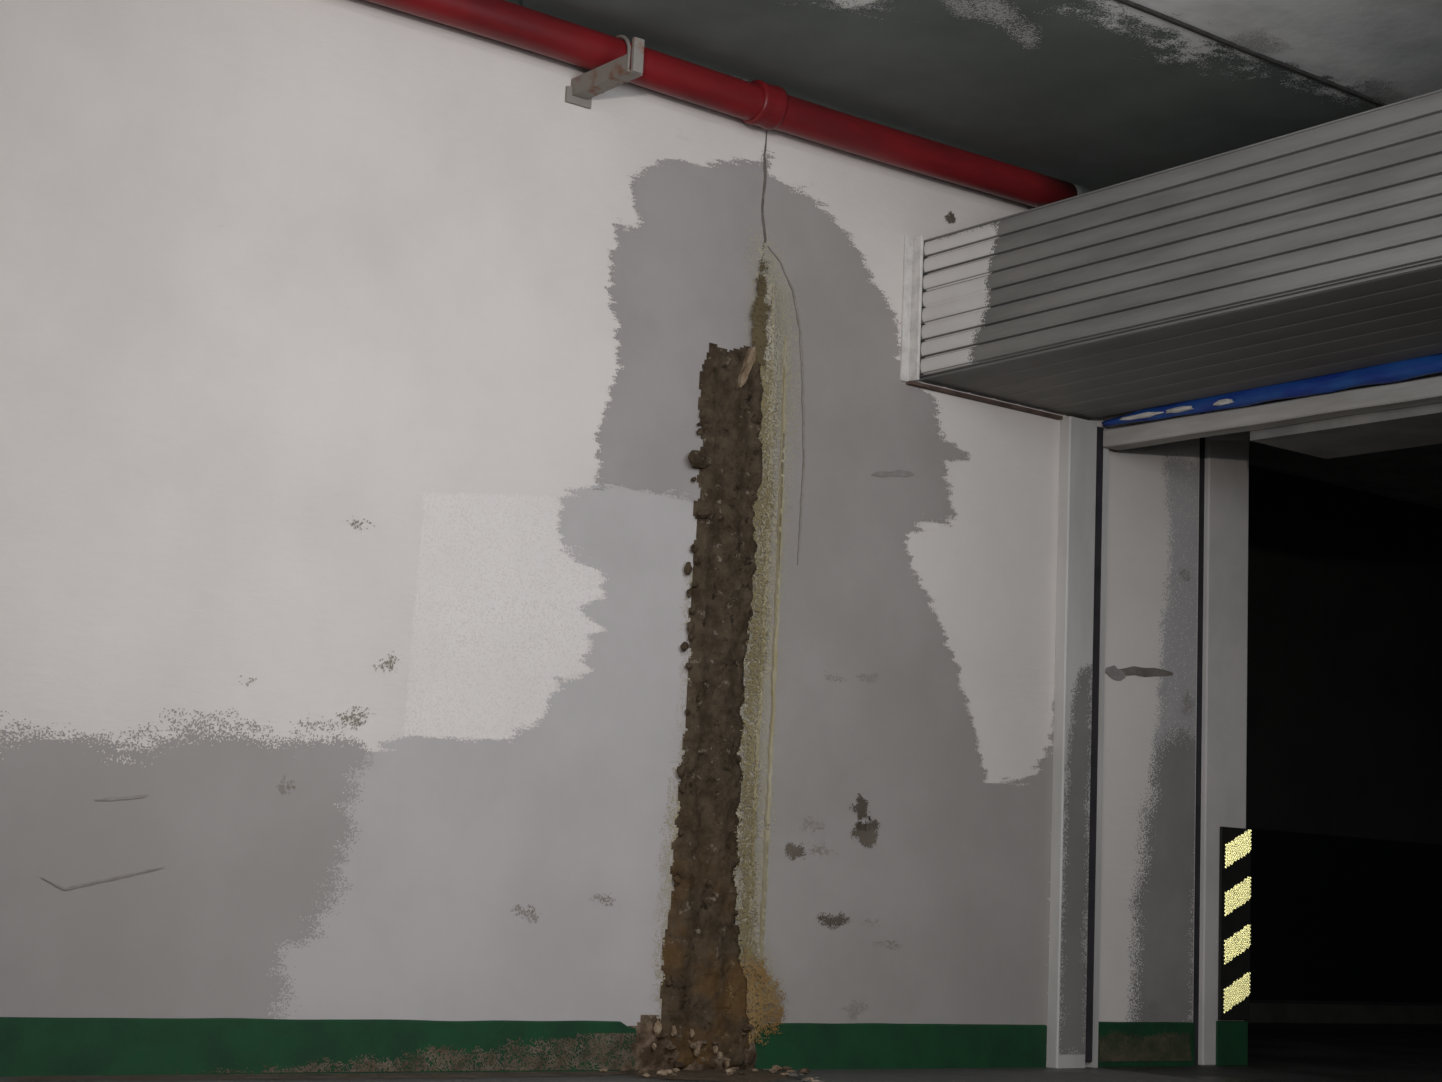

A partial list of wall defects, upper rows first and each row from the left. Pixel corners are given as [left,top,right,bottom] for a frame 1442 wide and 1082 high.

crack [757,130,805,565]
damp [0,150,1093,1070]
peeling [849,794,880,848]